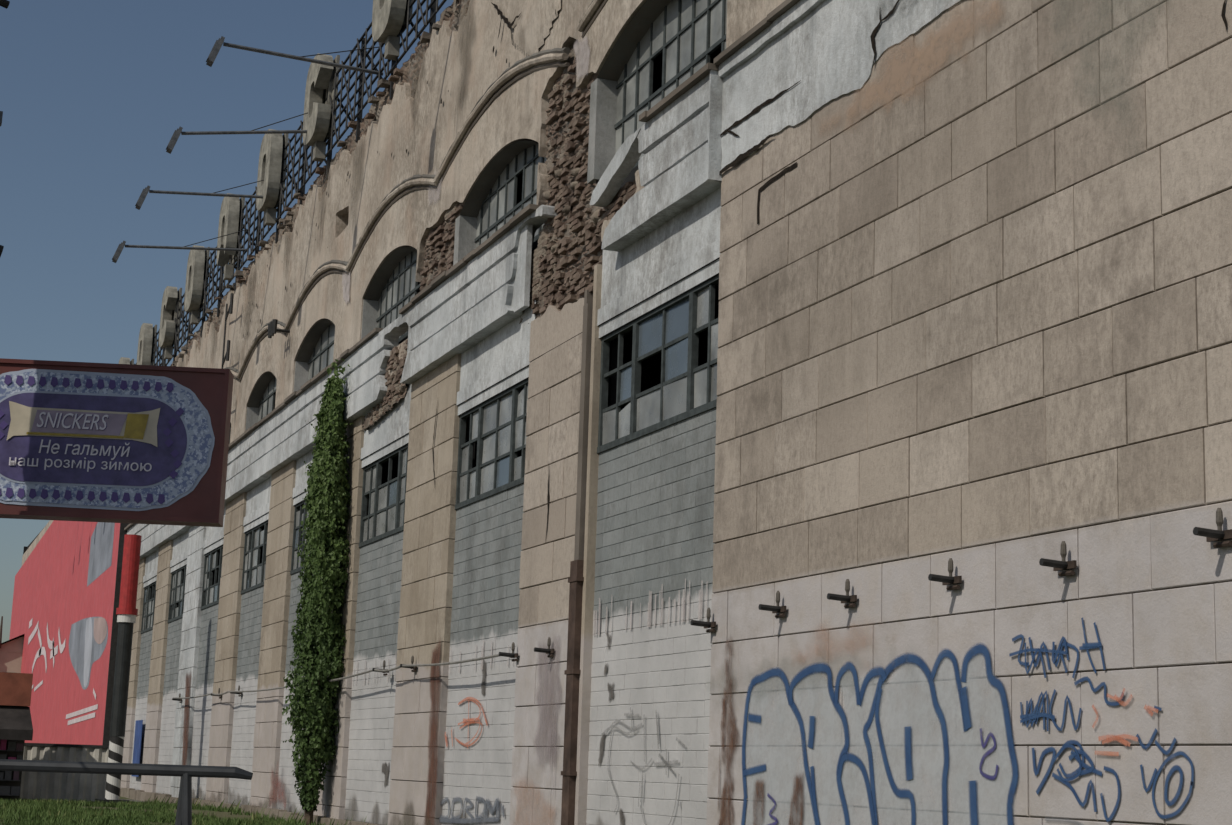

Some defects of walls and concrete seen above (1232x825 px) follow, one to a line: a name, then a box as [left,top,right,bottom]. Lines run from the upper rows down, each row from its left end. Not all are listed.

crack [491,2,521,45]
crack [870,0,899,67]
crack [719,80,801,175]
flaking render [519,38,642,324]
crack [757,162,797,224]
flaking render [420,203,465,291]
flaking render [362,340,408,431]
rust [425,642,440,825]
rust [718,644,737,825]
rust [754,781,764,825]